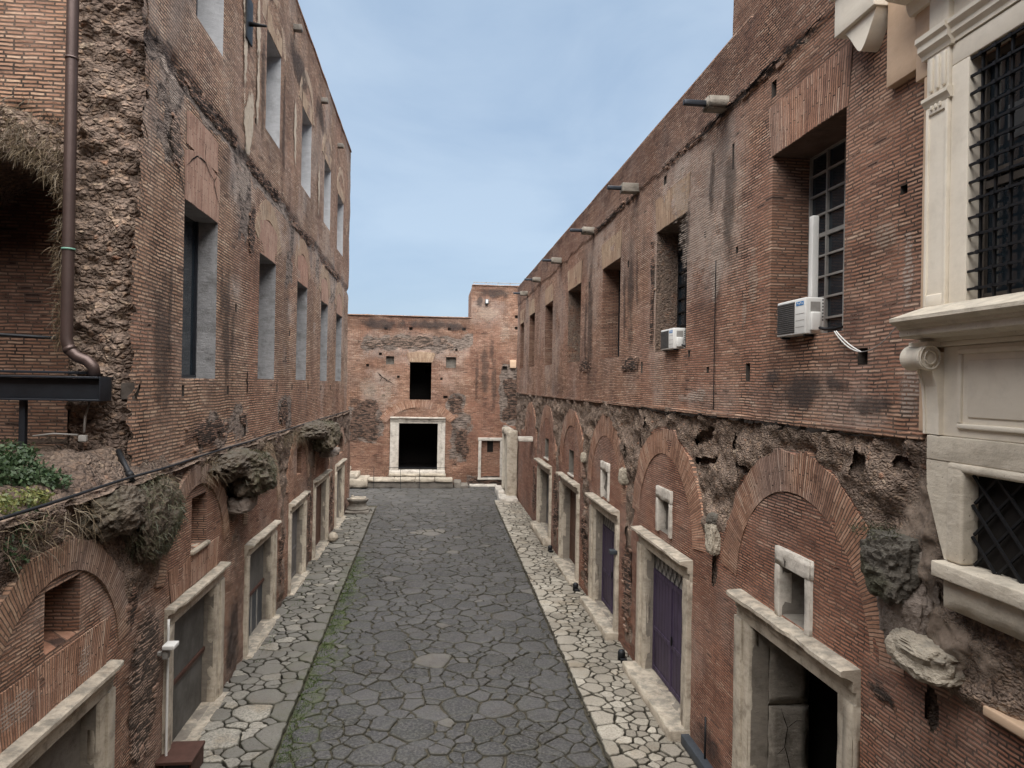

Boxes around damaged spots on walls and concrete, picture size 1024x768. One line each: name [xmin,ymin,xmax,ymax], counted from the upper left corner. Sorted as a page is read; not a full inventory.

spalling [350,394,385,444]
spalling [443,395,471,466]
spalling [694,426,718,466]
spalling [733,433,750,476]
spalling [848,446,866,481]
spalling [891,455,912,473]